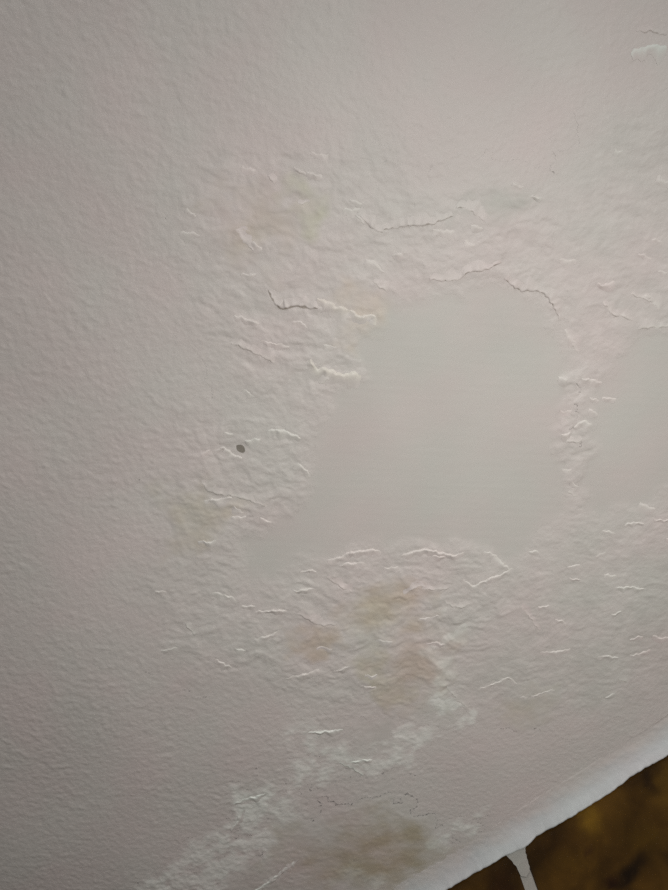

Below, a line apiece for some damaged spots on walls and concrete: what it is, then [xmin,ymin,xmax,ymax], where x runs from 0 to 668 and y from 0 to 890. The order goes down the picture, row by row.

peeling [548,334,668,515]
leakage [128,574,564,890]